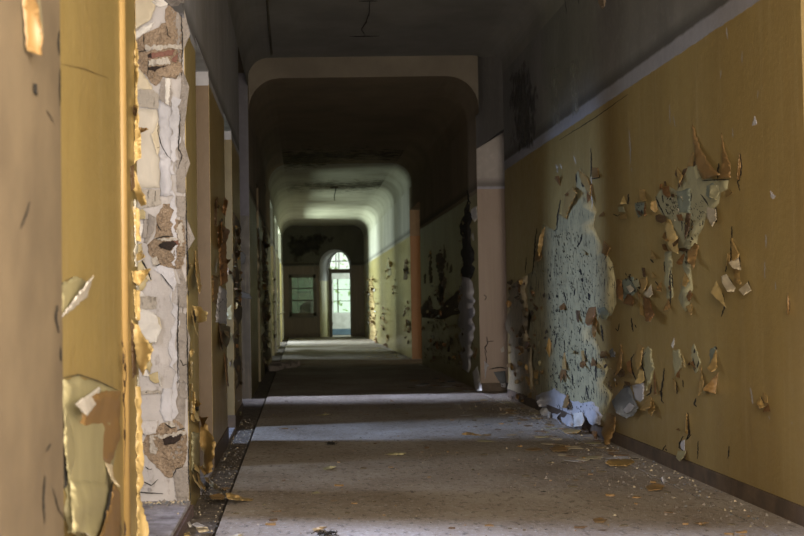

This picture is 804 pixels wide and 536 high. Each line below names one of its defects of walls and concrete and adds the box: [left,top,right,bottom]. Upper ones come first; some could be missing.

peeling [22,0,44,56]
peeling [62,276,94,318]
flaking render [130,0,243,536]
peeling [257,220,280,373]
peeling [363,276,388,347]
peeling [421,125,742,445]
peeling [710,227,751,317]
peeling [63,374,121,536]
peeling [676,413,691,461]